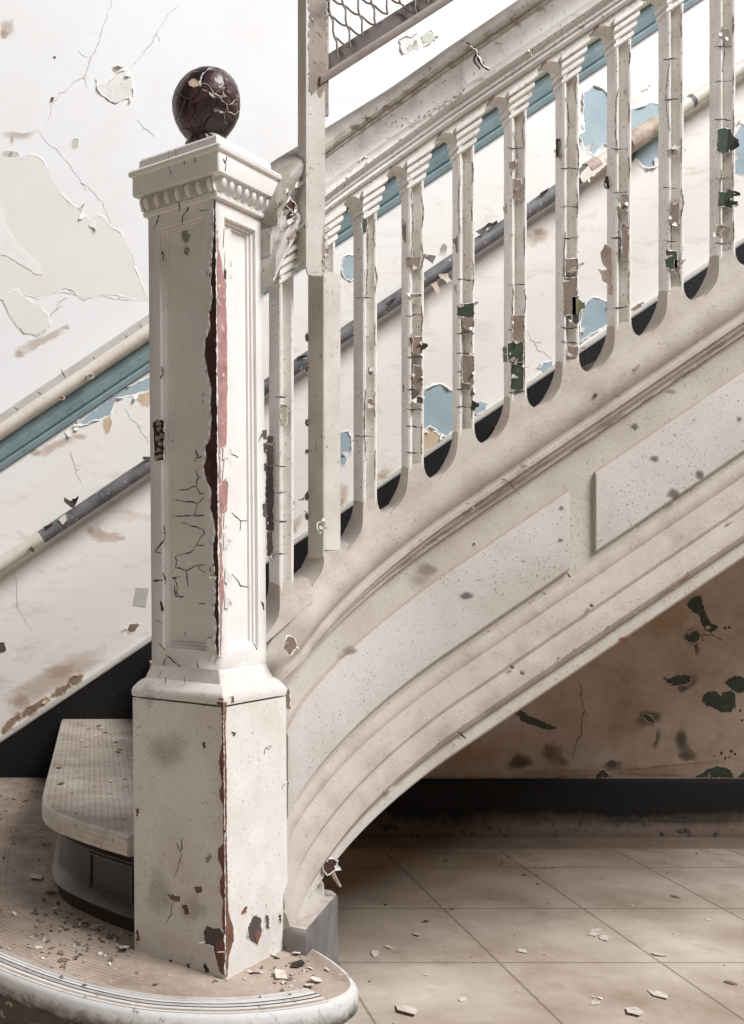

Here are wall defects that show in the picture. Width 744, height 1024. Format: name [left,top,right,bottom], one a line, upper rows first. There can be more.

peeling [0,150,149,337]
crack [40,1,196,226]
crack [201,83,240,123]
peeling [717,189,740,209]
peeling [716,117,744,176]
peeling [65,373,150,437]
peeling [201,200,233,657]
peeling [403,336,452,452]
crack [153,450,212,685]
crack [572,681,587,756]
crack [166,840,183,923]
peeling [167,695,282,977]